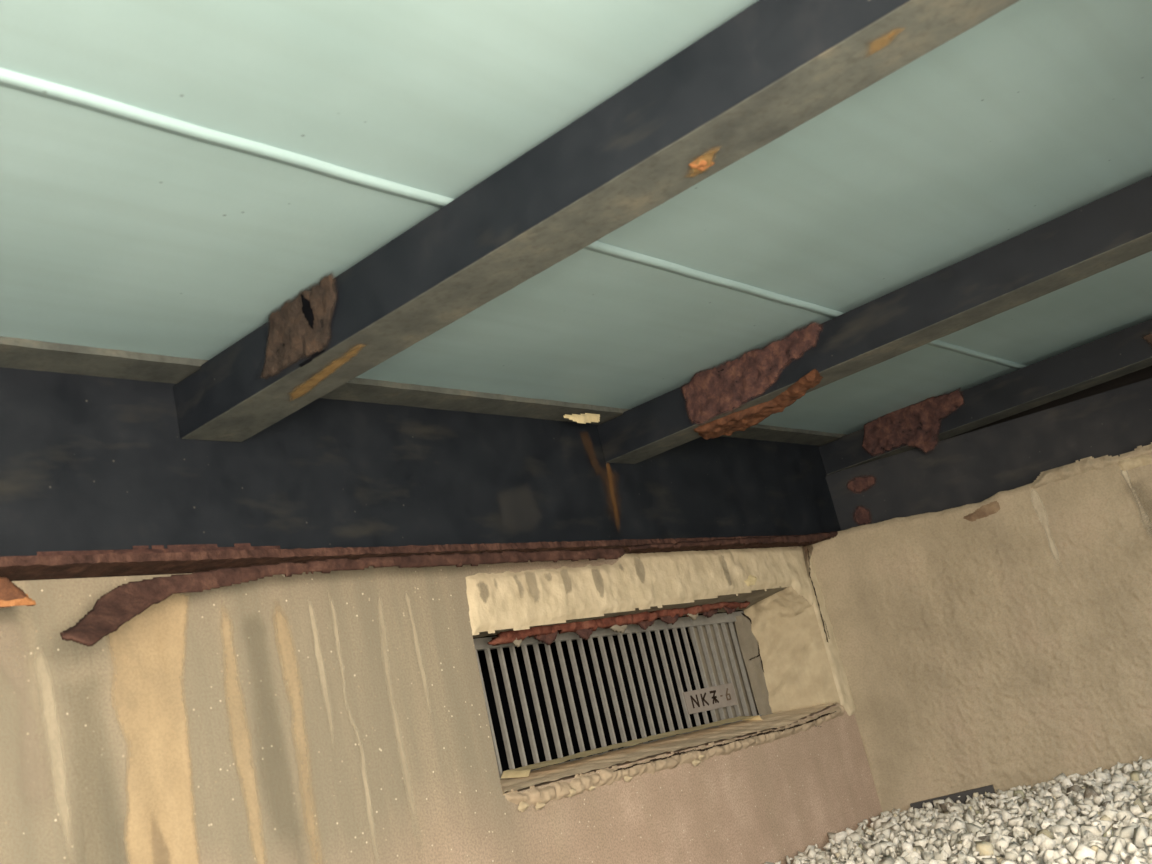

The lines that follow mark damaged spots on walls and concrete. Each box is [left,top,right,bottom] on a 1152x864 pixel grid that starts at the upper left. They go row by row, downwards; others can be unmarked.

corrosion [261,273,364,400]
corrosion [582,434,618,521]
corrosion [681,322,824,440]
corrosion [847,476,876,525]
corrosion [862,388,964,455]
corrosion [0,531,838,647]
spalling [488,601,750,647]
leakage [109,593,198,864]
leakage [222,616,265,864]